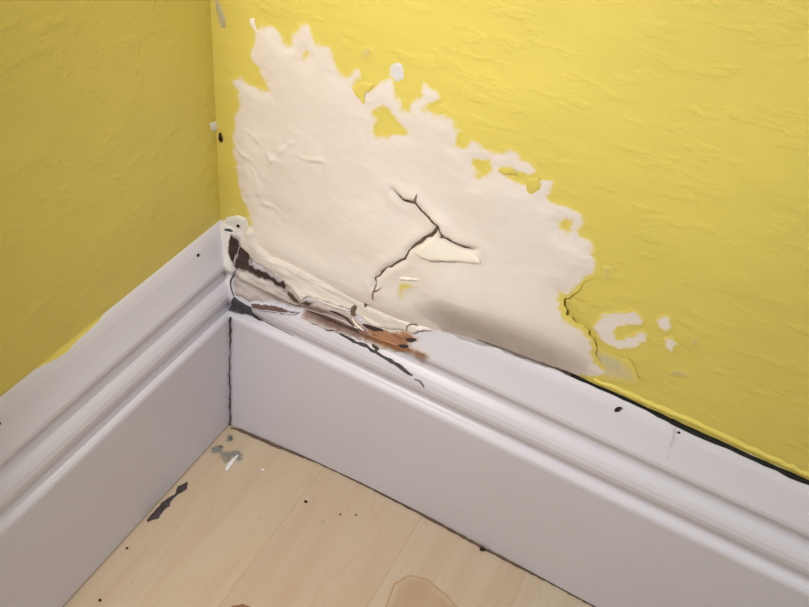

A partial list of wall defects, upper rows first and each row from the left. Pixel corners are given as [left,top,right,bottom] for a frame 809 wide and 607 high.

crack [351,190,476,316]
peeling [220,18,679,380]
crack [312,323,424,388]